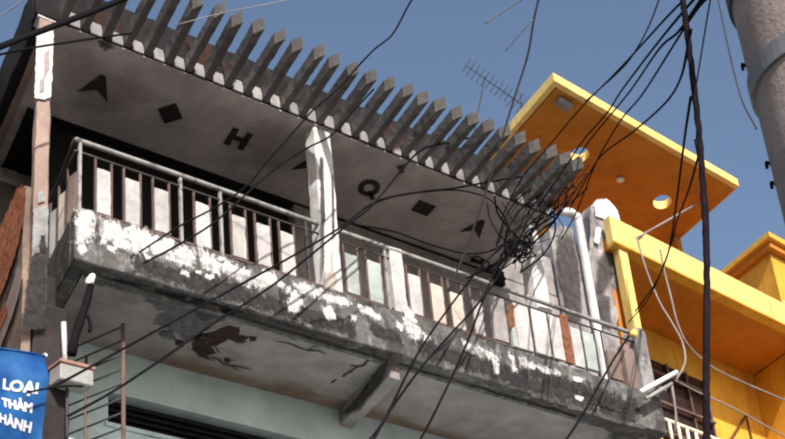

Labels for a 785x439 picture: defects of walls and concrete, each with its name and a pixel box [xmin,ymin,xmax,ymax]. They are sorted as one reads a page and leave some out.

flaking render [175,322,256,363]
peeling [74,209,382,322]
leakage [94,253,378,355]
crack [257,289,325,355]
crack [330,360,369,383]
leakage [343,320,403,414]
peeling [461,340,561,376]
leakage [410,332,641,423]
leakage [596,252,616,327]